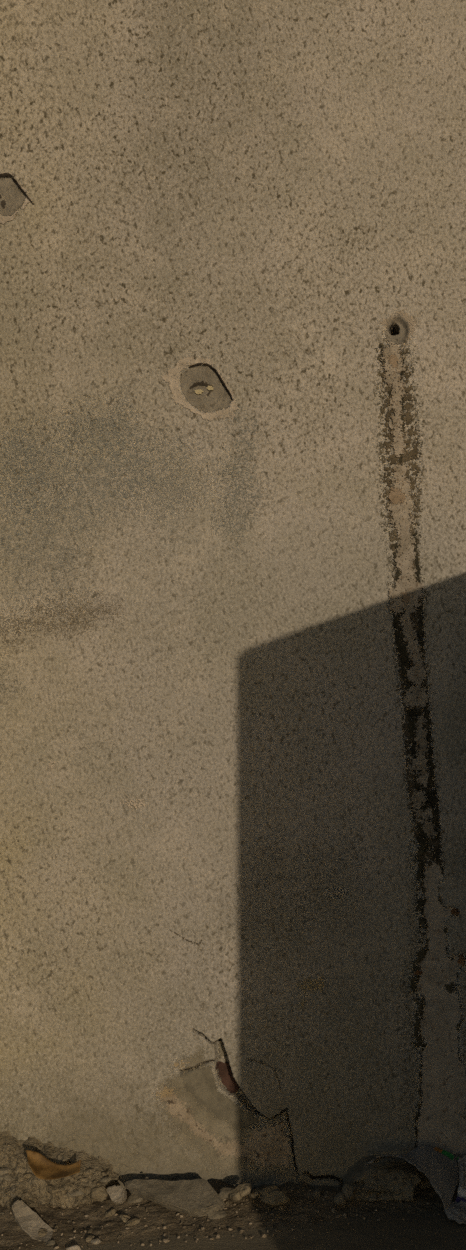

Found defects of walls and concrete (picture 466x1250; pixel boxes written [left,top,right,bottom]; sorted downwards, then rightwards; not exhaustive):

spalling [0,172,34,224]
spalling [162,356,238,421]
spalling [152,1033,297,1183]